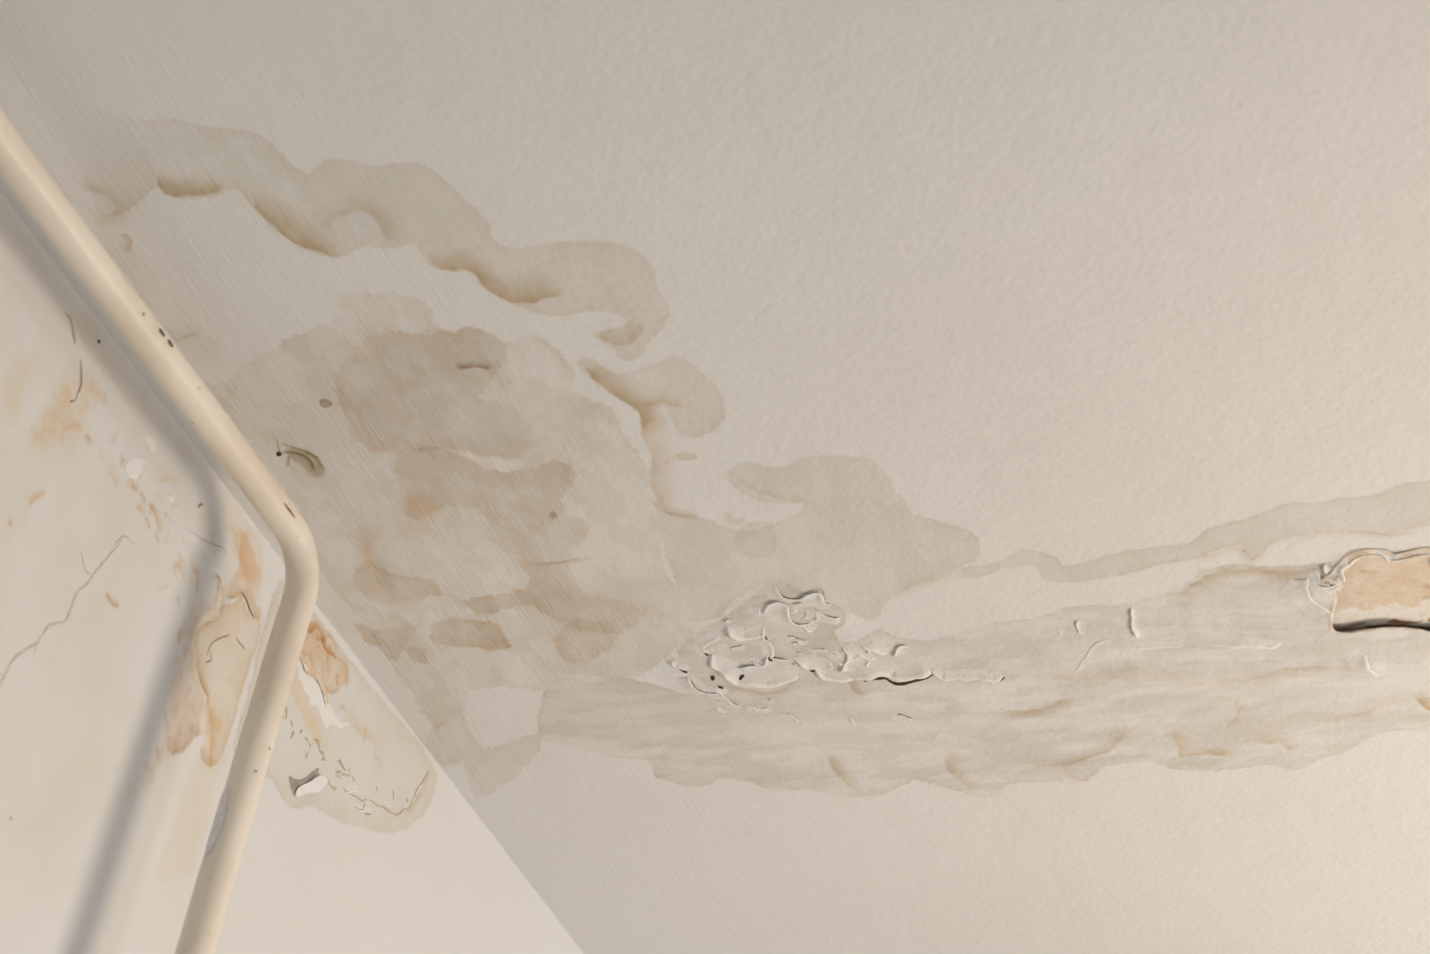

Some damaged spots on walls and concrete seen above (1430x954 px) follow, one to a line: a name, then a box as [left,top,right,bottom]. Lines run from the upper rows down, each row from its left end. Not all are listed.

leakage [62,99,1430,834]
crack [0,535,135,685]
peeling [671,584,1005,727]
spalling [1288,547,1430,635]
spalling [289,768,327,797]